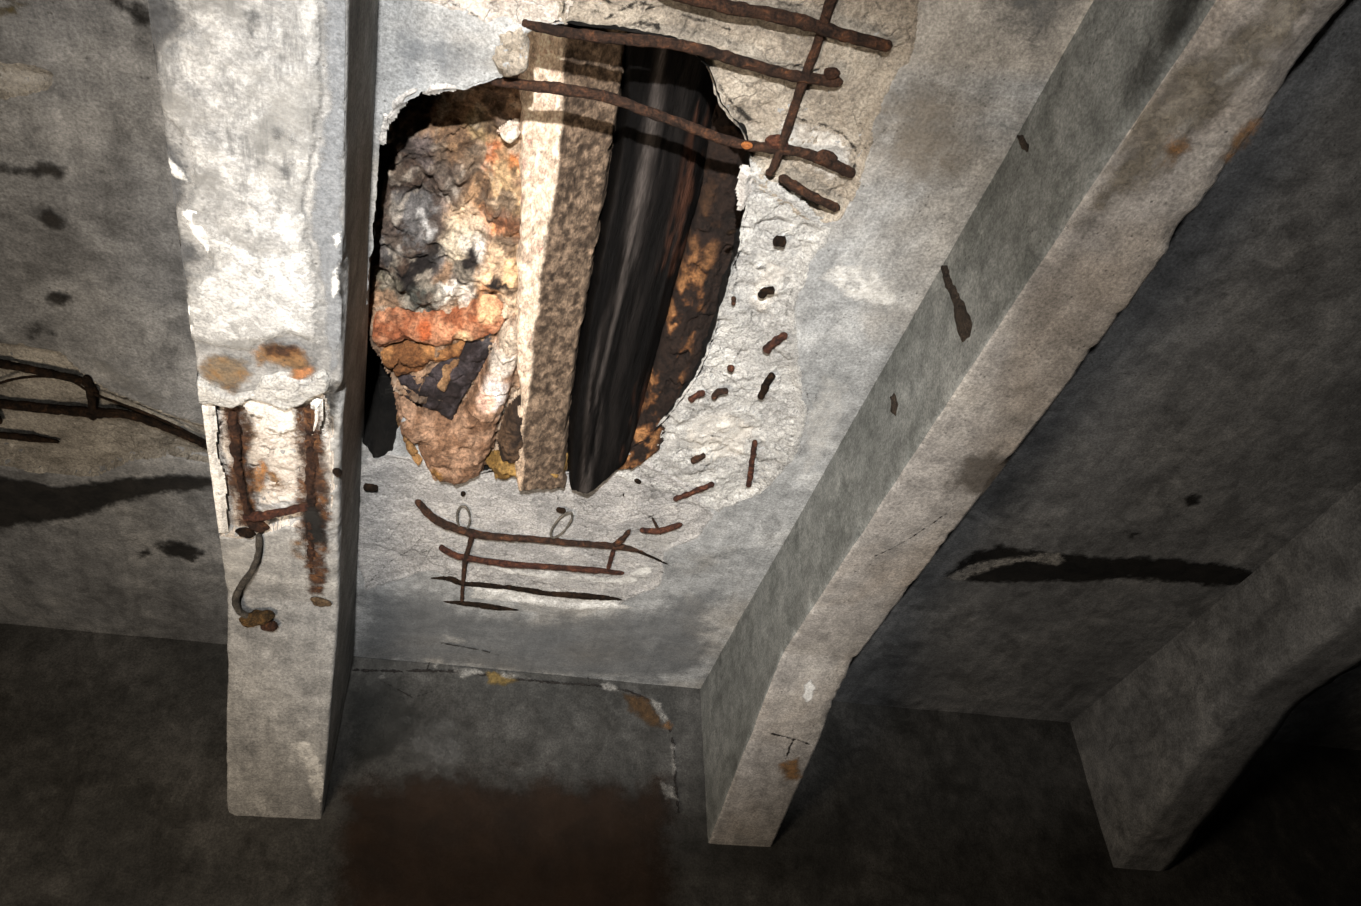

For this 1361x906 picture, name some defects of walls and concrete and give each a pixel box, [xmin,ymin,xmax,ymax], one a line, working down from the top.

spalling [0,62,54,100]
spalling [357,0,919,610]
spalling [0,343,337,539]
rust [201,344,338,595]
peeling [310,597,332,607]